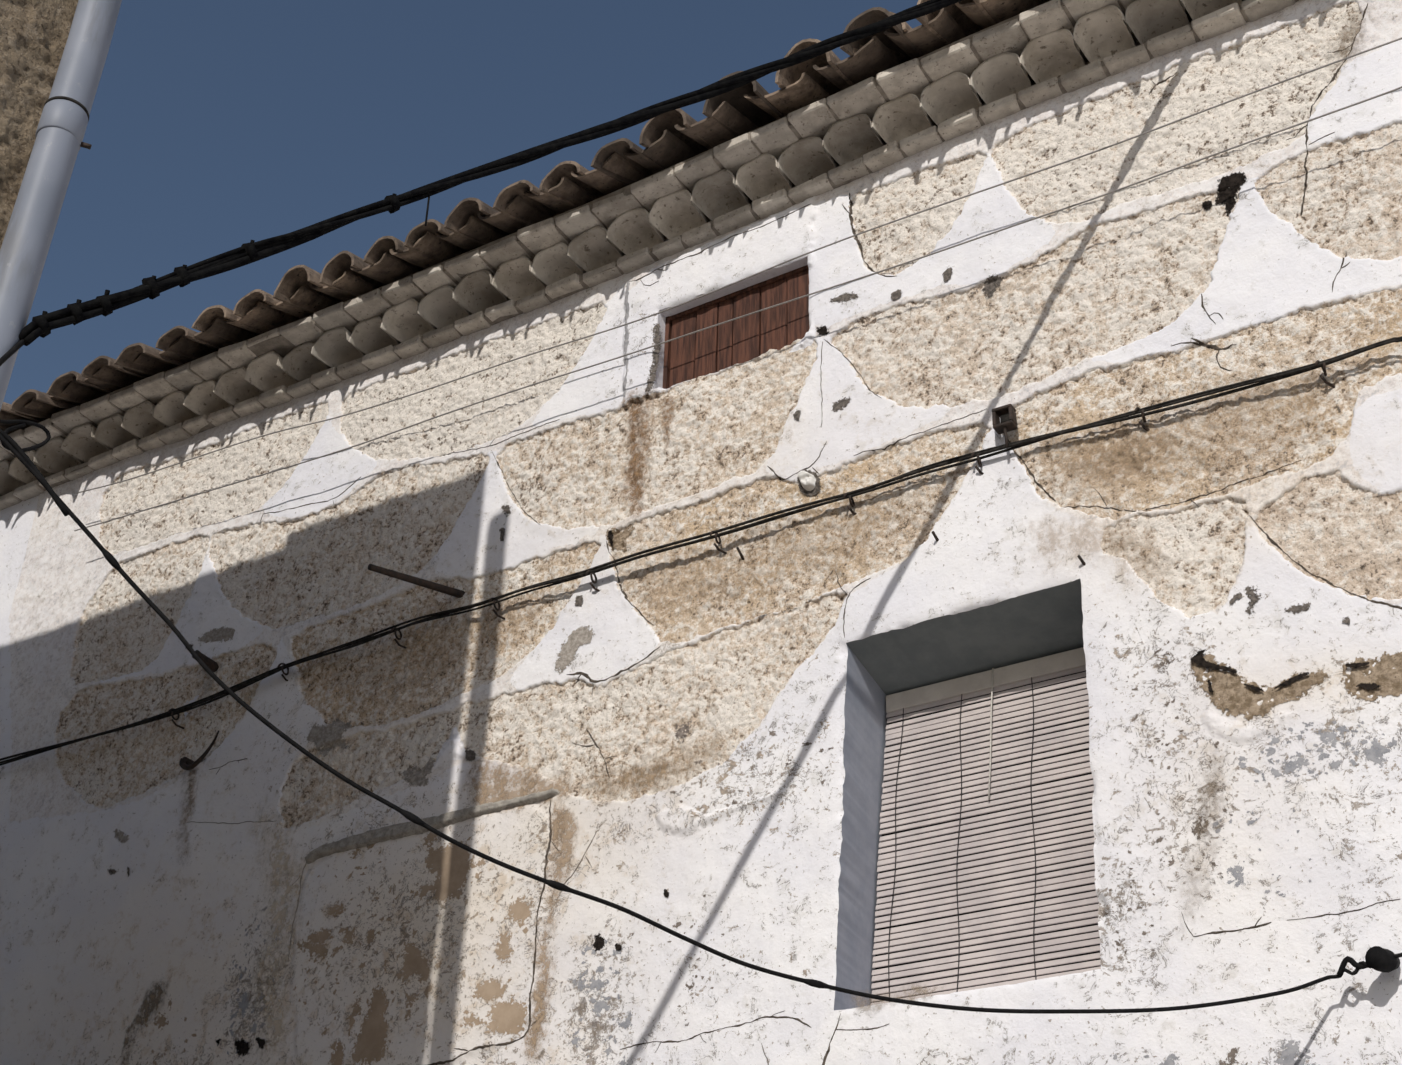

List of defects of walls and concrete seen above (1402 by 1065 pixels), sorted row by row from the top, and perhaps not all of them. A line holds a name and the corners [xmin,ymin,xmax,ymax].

crack [1287,3,1368,216]
peeling [55,2,1402,829]
peeling [216,832,486,1065]
crack [428,801,597,1065]
crack [620,1011,888,1065]
crack [1181,899,1399,937]